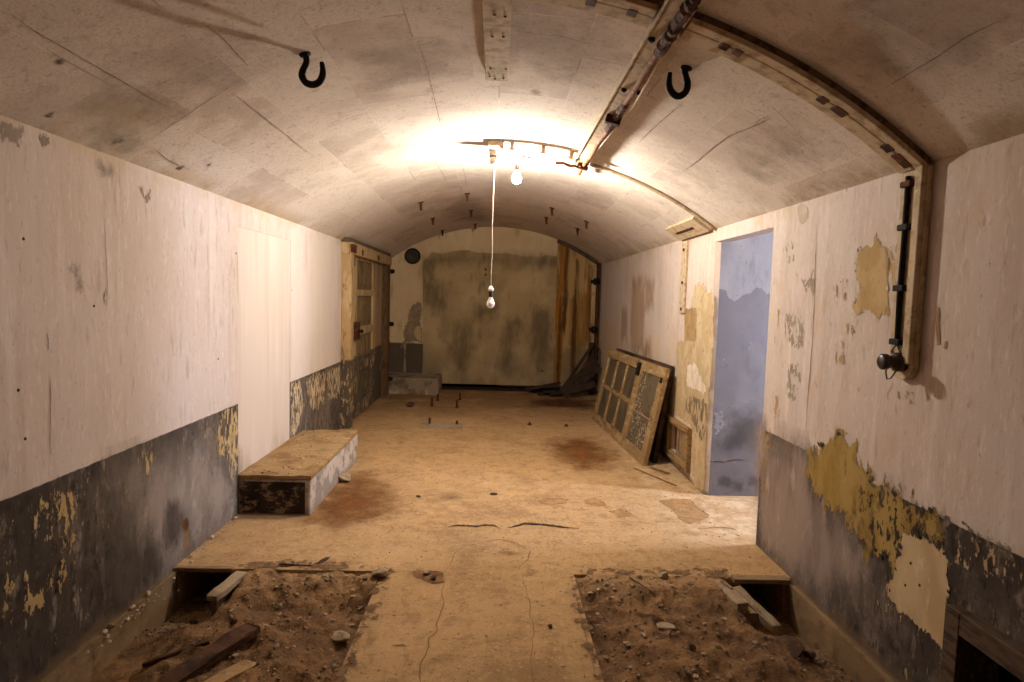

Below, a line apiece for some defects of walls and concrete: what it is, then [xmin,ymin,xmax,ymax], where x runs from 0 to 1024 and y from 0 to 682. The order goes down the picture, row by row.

crack [684,107,805,171]
peeling [834,233,897,364]
peeling [2,490,78,626]
peeling [117,405,240,558]
peeling [290,366,341,436]
rust [305,474,385,525]
crack [392,517,579,682]
rust [552,439,608,468]
peeling [674,282,726,491]
peeling [755,363,1022,649]